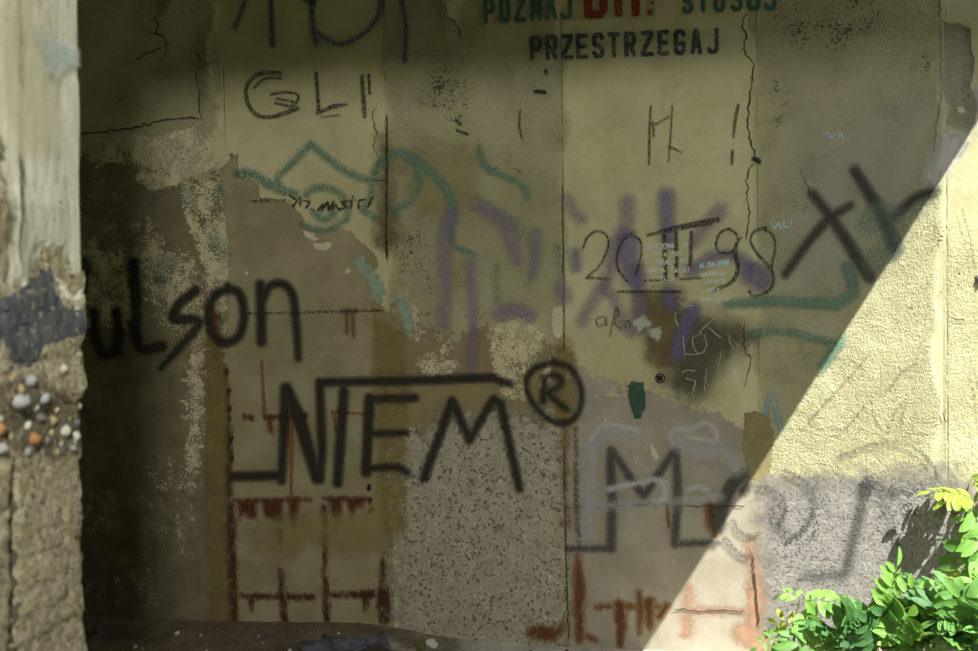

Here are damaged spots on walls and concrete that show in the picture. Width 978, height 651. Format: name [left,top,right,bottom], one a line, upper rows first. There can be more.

crack [17,18,25,86]
crack [131,15,167,63]
crack [80,50,218,135]
crack [740,14,756,241]
flaking render [941,20,977,158]
flaking render [0,126,571,651]
peeling [632,315,662,341]
rust [224,360,391,624]
rust [528,427,598,643]
rust [595,590,670,648]
rust [682,542,770,651]
peeling [563,358,978,651]